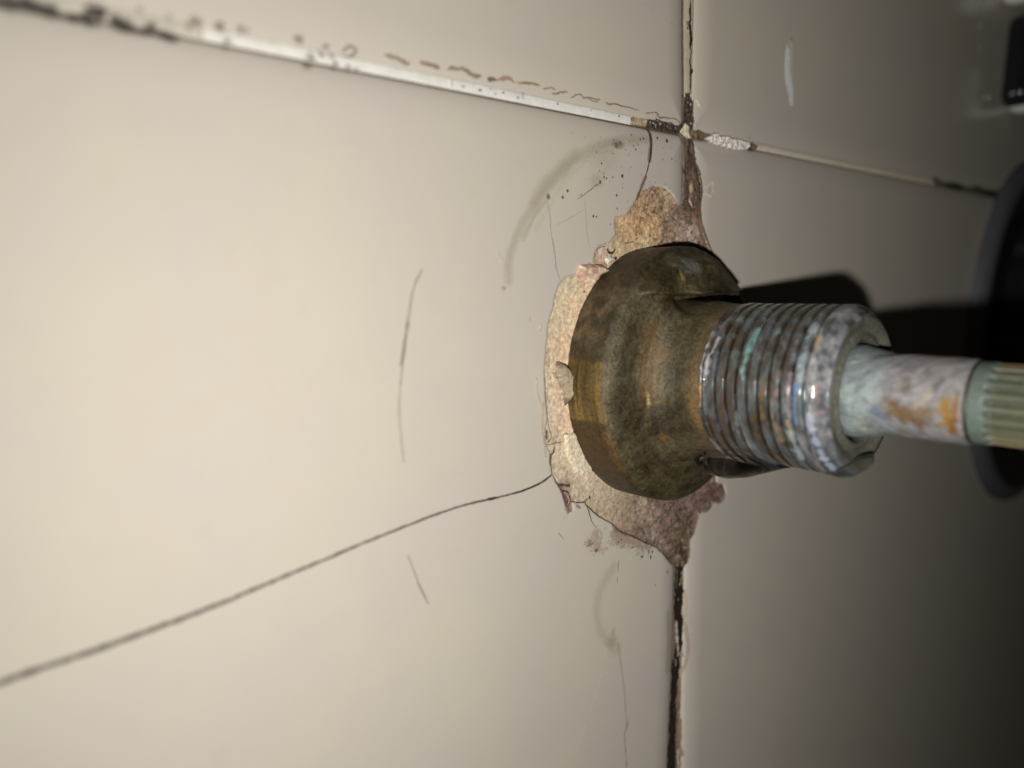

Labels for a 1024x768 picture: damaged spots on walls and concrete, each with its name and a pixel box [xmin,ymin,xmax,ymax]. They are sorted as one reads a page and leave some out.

corrosion [384,54,680,123]
spalling [544,172,726,567]
crack [0,475,552,685]